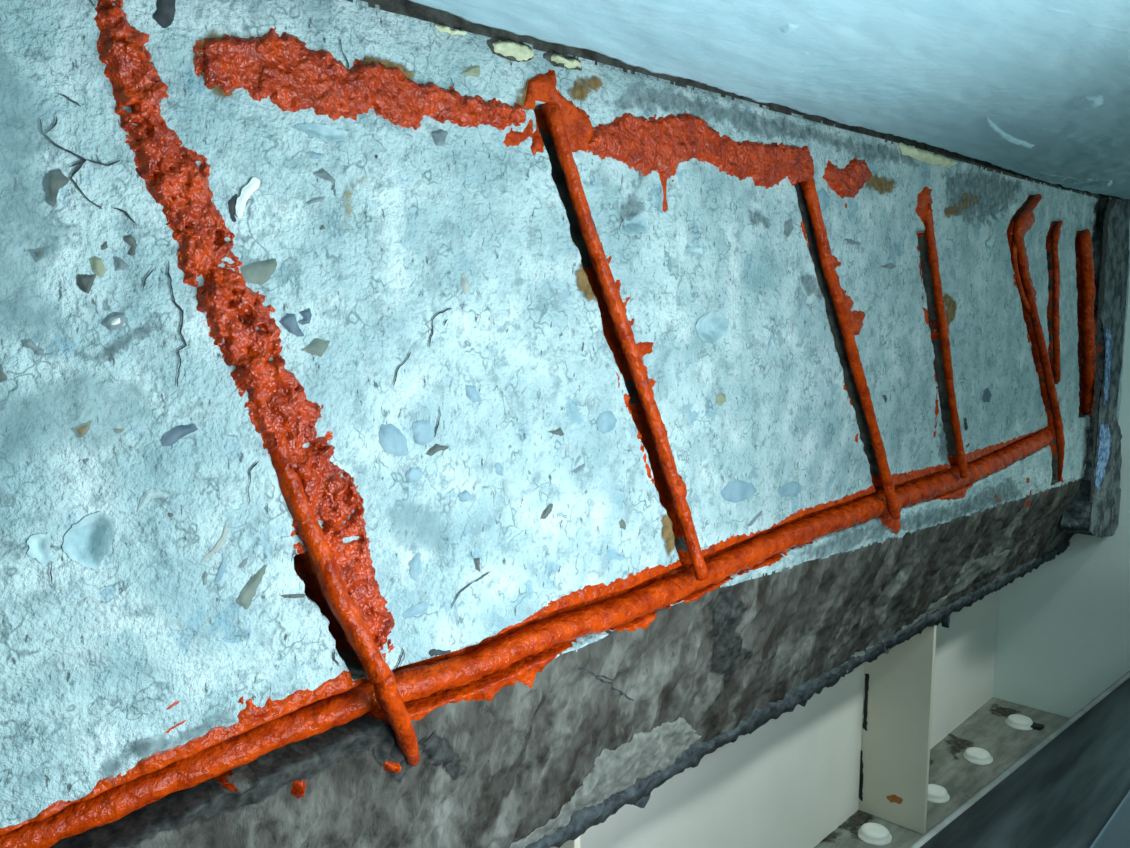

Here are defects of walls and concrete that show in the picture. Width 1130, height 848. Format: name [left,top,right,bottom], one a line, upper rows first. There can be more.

peeling [487,37,534,62]
peeling [543,51,582,71]
corrosion [569,76,603,101]
corrosion [866,174,895,194]
corrosion [575,264,597,301]
spalling [1075,229,1101,418]
spalling [391,70,1065,721]
spalling [0,0,420,848]
corrosion [662,515,675,555]
spalling [525,541,1070,848]
corrosion [353,713,412,783]
corrosion [821,810,873,842]